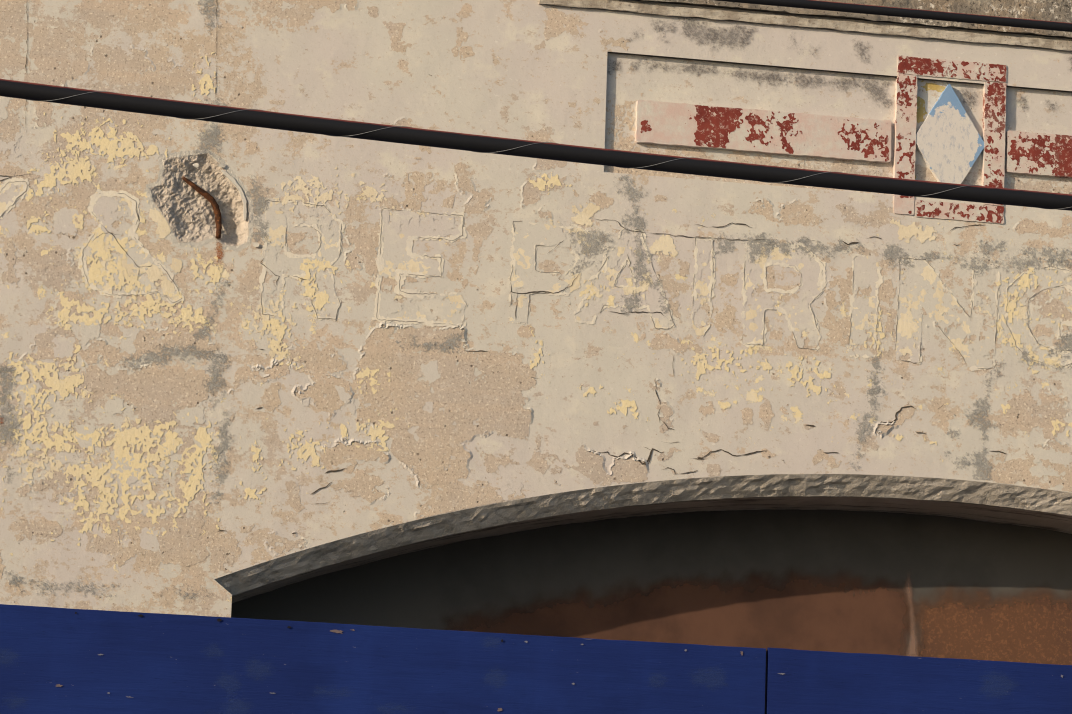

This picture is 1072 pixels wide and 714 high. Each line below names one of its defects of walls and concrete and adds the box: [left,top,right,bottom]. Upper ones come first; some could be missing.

peeling [229,76,285,109]
peeling [897,56,1006,123]
peeling [381,116,422,129]
peeling [526,128,555,143]
peeling [605,93,652,152]
peeling [661,105,916,179]
peeling [604,166,729,182]
peeling [890,195,1072,244]
peeling [227,145,681,518]
peeling [636,234,836,402]
crack [589,358,765,477]
crack [875,404,944,434]